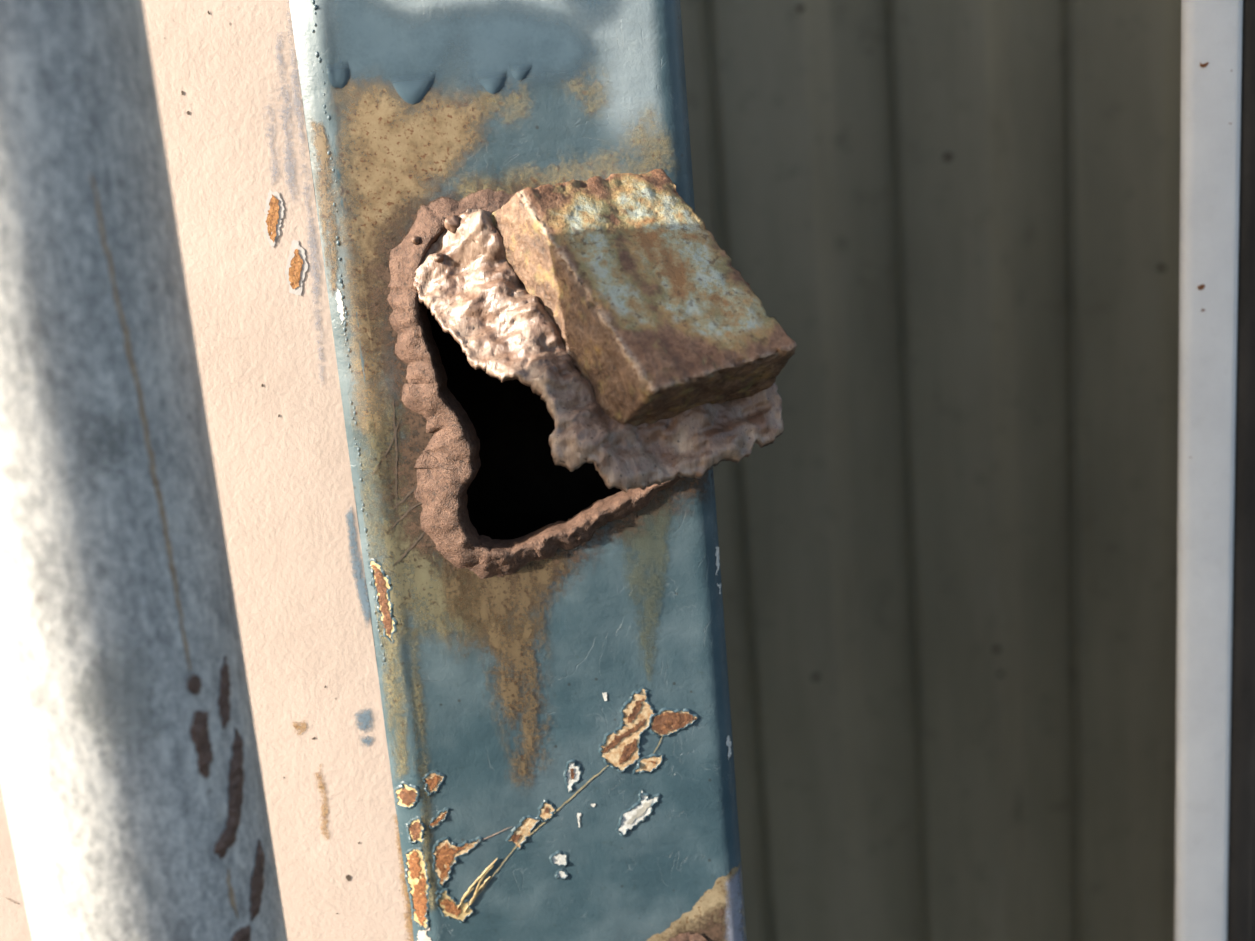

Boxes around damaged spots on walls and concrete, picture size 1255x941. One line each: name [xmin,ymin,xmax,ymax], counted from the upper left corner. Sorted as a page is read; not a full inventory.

rust [91,175,202,695]
rust [311,84,713,907]
peeling [598,687,699,774]
rust [190,654,265,941]
peeling [393,770,497,941]
peeling [505,799,557,850]
peeling [549,850,569,880]
peeling [563,759,583,794]
peeling [615,788,661,837]
peeling [647,861,746,941]
rust [673,907,729,941]